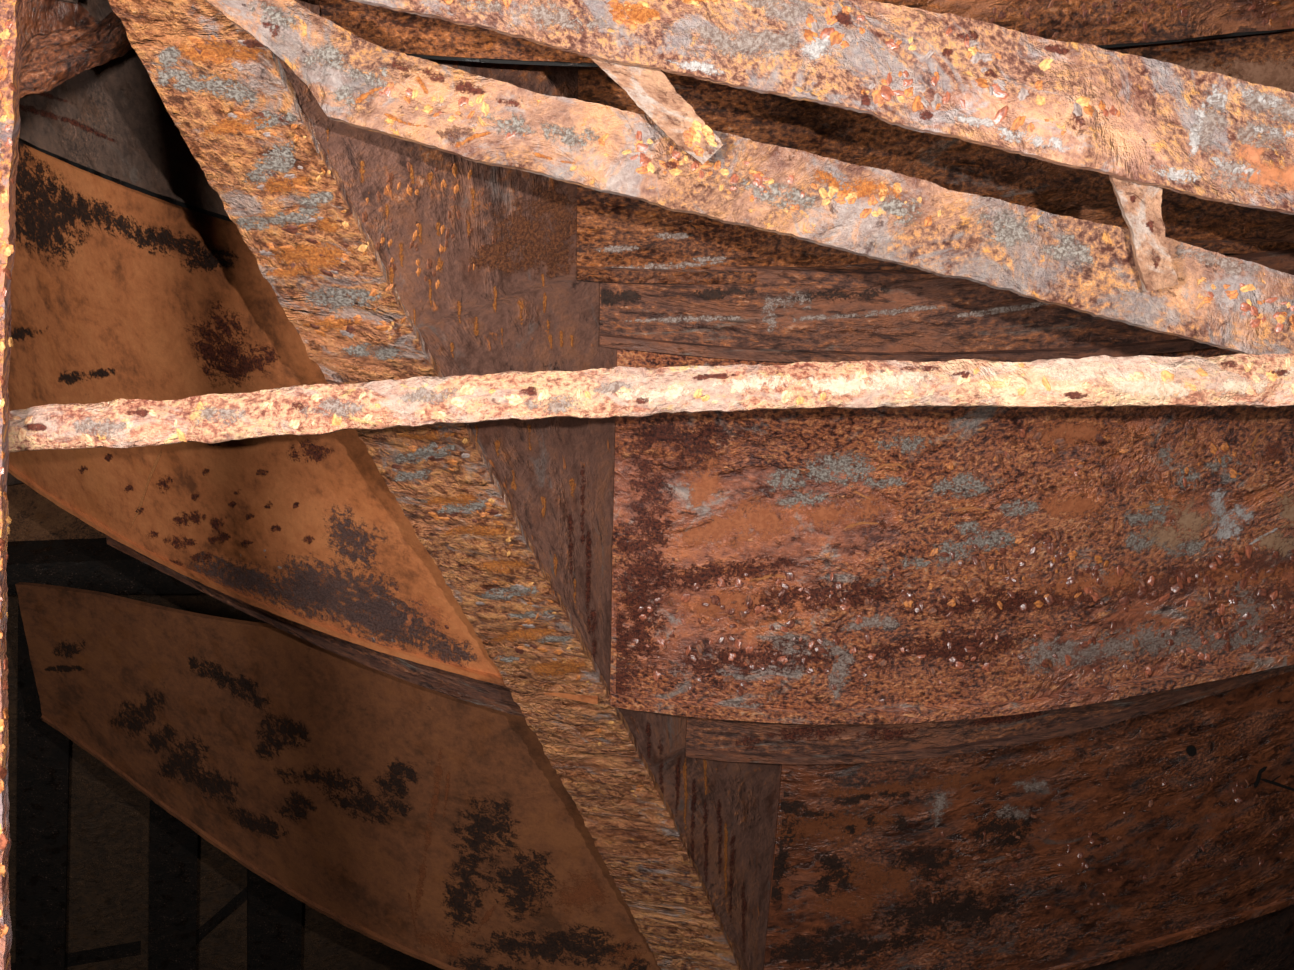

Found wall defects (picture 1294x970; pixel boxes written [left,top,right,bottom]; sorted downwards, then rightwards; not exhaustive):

rust [803,1,865,49]
rust [861,36,966,112]
rust [946,27,1066,135]
rust [1156,56,1294,93]
rust [598,120,941,227]
rust [266,161,577,350]
damp [187,302,280,385]
damp [288,439,333,464]
damp [189,506,477,666]
damp [44,640,85,673]
damp [110,657,422,839]
rust [0,824,10,877]